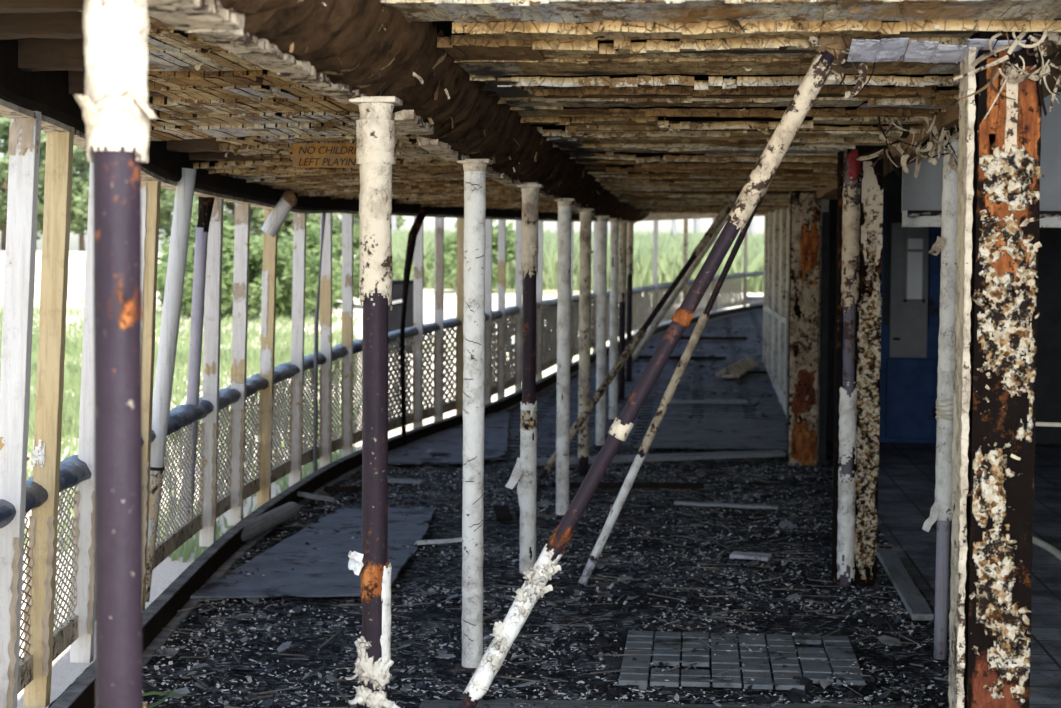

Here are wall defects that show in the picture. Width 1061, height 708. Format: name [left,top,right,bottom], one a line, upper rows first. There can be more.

peeling [847,22,1026,63]
corrosion [979,51,1041,287]
peeling [320,159,404,348]
peeling [380,46,942,708]
corrosion [791,361,817,466]
peeling [922,139,959,532]
peeling [966,145,1044,705]
peeling [348,537,364,576]
corrosion [360,561,389,601]
corrosion [546,527,575,555]
peeling [143,598,361,708]
corrosion [971,653,1021,708]